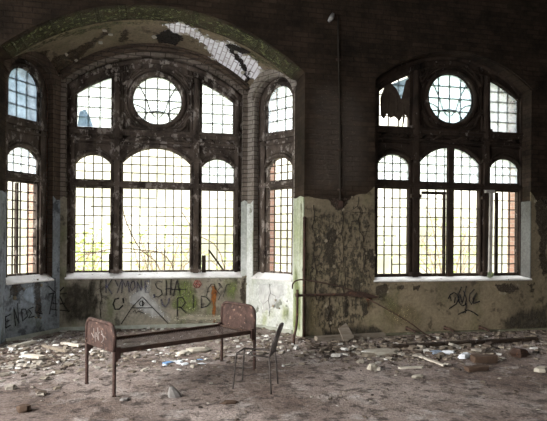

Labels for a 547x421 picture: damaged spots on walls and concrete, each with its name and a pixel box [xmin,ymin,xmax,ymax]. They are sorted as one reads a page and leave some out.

flaking render [152,21,265,82]
spalling [376,282,404,300]
spalling [495,283,520,295]
water stain [501,307,547,329]
water stain [349,326,381,334]